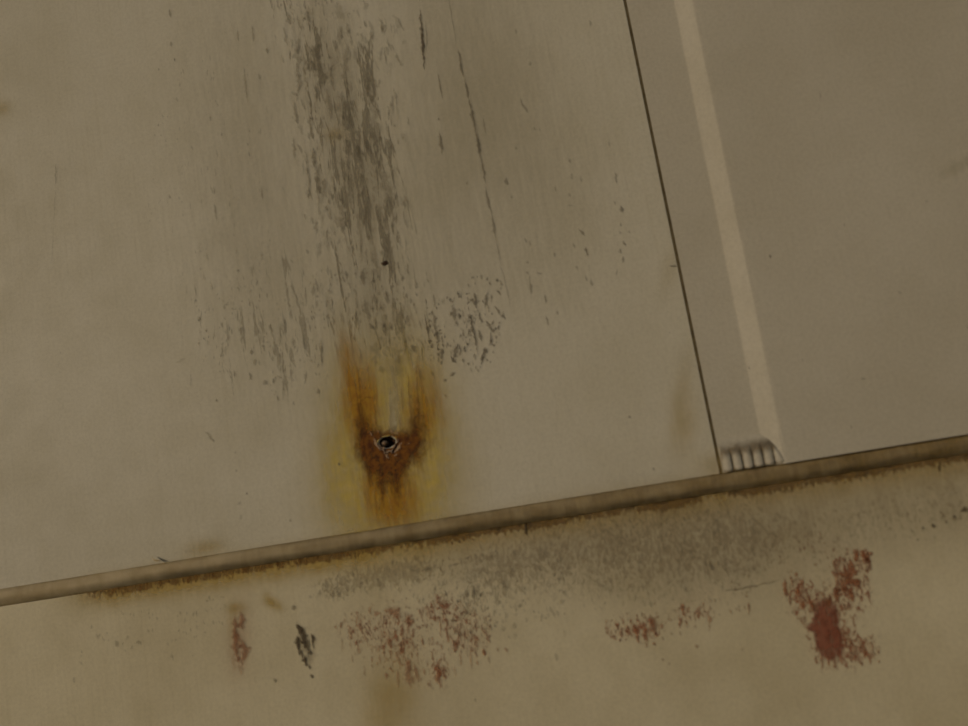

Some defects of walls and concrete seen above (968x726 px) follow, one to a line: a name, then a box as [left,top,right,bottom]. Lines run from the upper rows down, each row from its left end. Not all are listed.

corrosion [326,354,445,532]
corrosion [0,454,968,607]